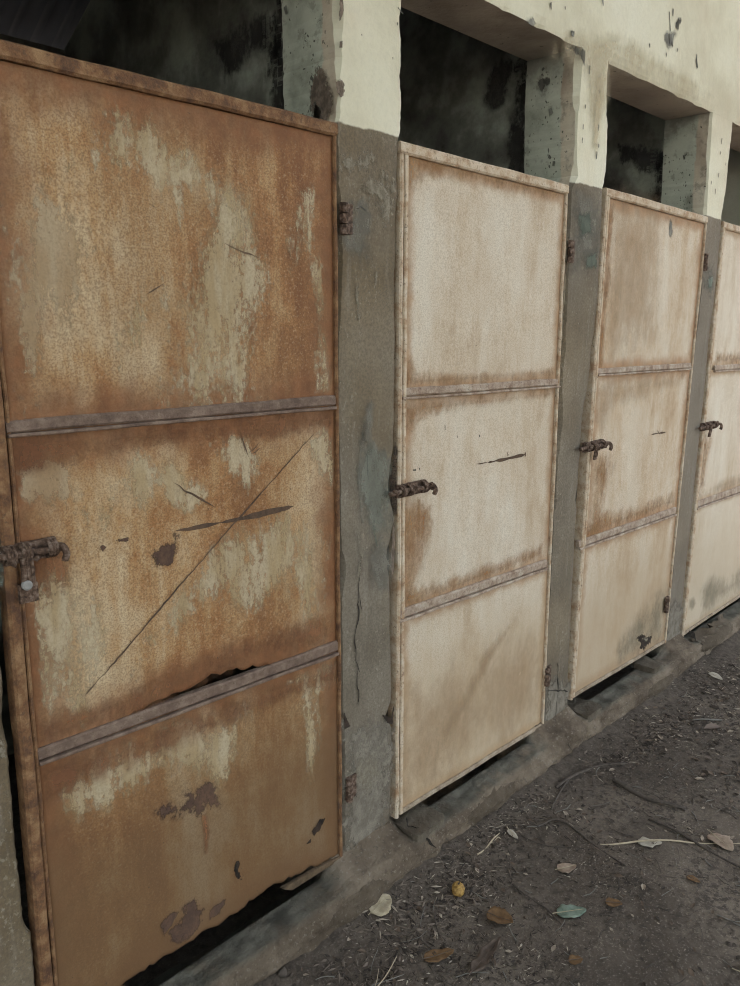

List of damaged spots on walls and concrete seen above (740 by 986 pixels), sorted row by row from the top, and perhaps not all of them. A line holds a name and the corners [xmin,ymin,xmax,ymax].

leakage [267,0,297,109]
leakage [664,9,681,57]
leakage [336,80,345,97]
corrosion [152,533,179,566]
crack [354,557,362,706]
corrosion [155,782,219,849]
corrosion [161,900,225,943]